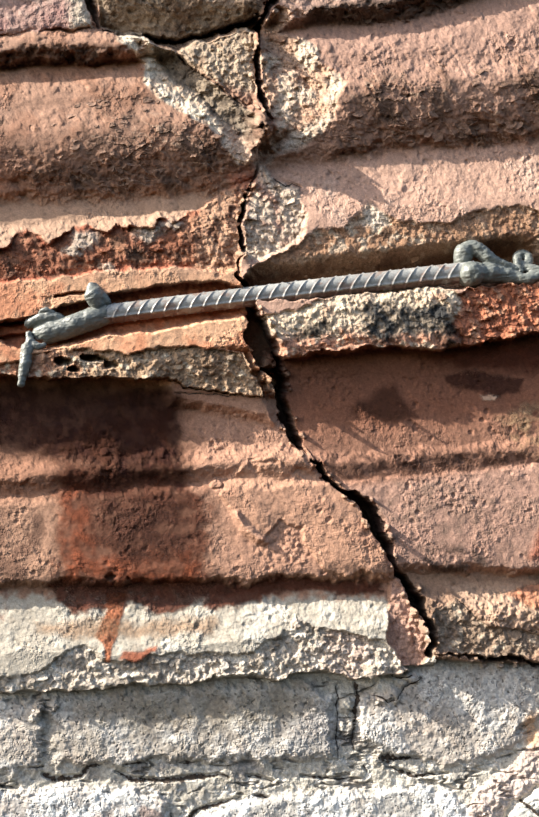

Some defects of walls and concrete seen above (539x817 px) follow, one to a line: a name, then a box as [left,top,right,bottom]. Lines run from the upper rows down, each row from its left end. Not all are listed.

spalling [0,6,539,287]
leakage [0,382,178,491]
spalling [0,346,265,399]
crack [234,178,539,668]
spalling [262,281,539,360]
rust [58,467,209,663]
spalling [0,617,409,695]
crack [304,667,448,780]
crack [519,799,539,816]